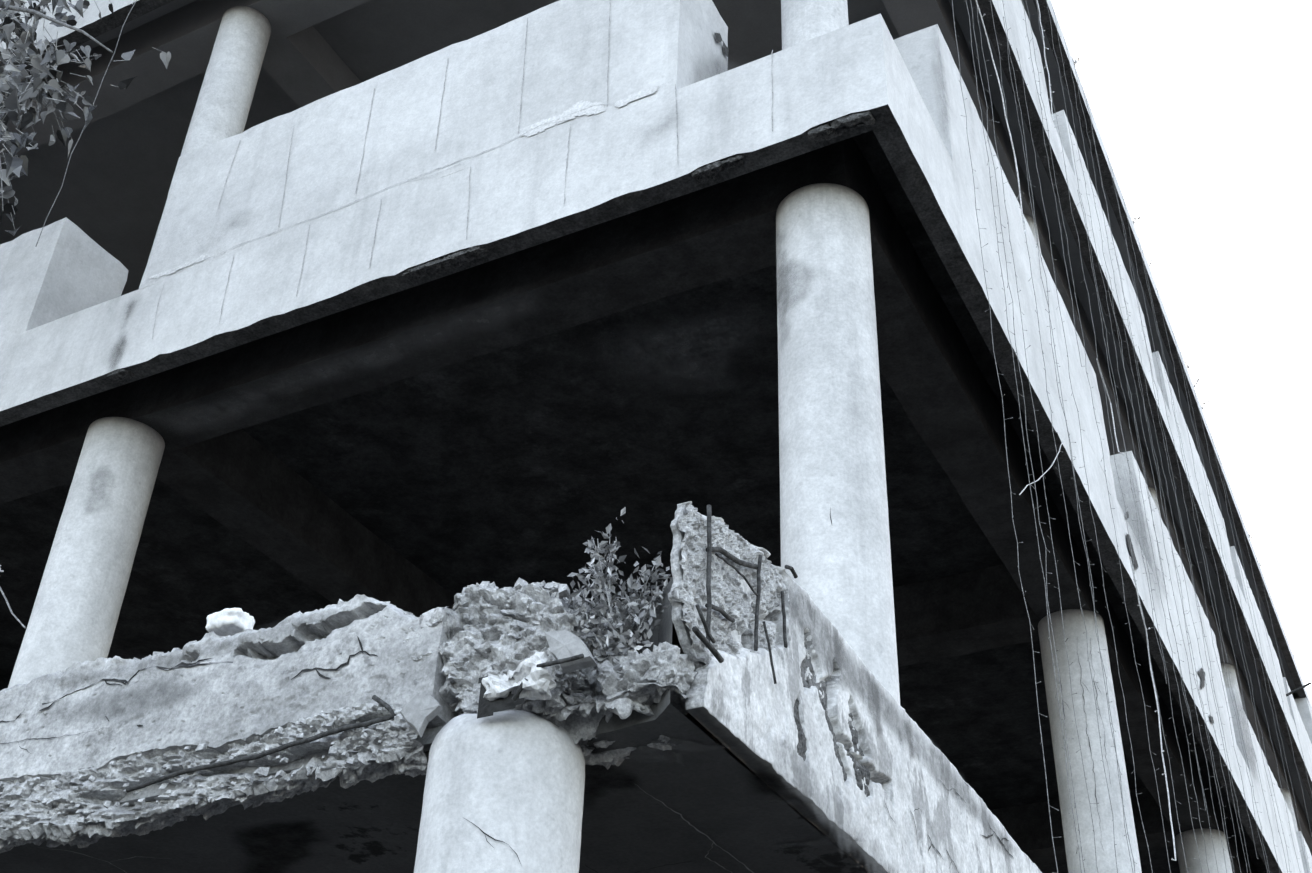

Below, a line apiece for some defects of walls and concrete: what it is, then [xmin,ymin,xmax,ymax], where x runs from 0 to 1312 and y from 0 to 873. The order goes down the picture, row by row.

flaking render [519,85,657,137]
spalling [0,695,443,853]
crack [291,636,378,680]
spalling [535,642,699,770]
spalling [793,641,871,797]